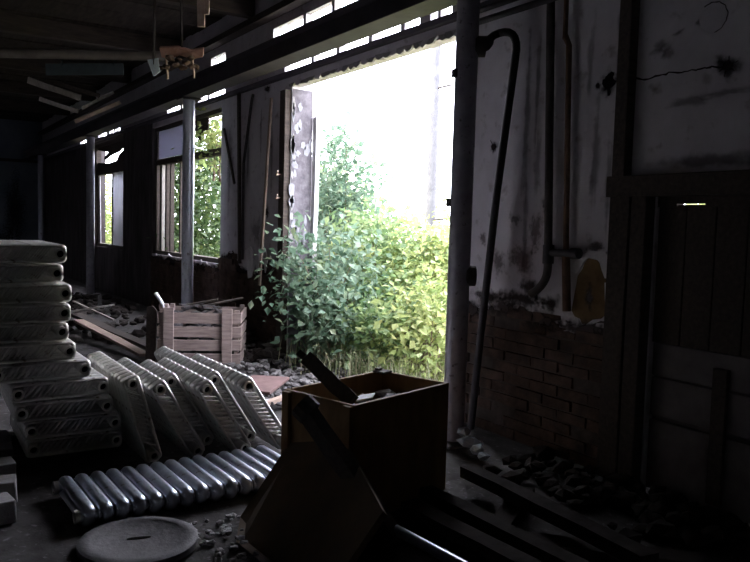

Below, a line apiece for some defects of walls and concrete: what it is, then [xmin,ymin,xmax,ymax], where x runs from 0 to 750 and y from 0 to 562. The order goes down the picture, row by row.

crack [636,56,740,81]
peeling [288,96,311,260]
leakage [476,281,559,312]
flaking render [464,243,607,469]